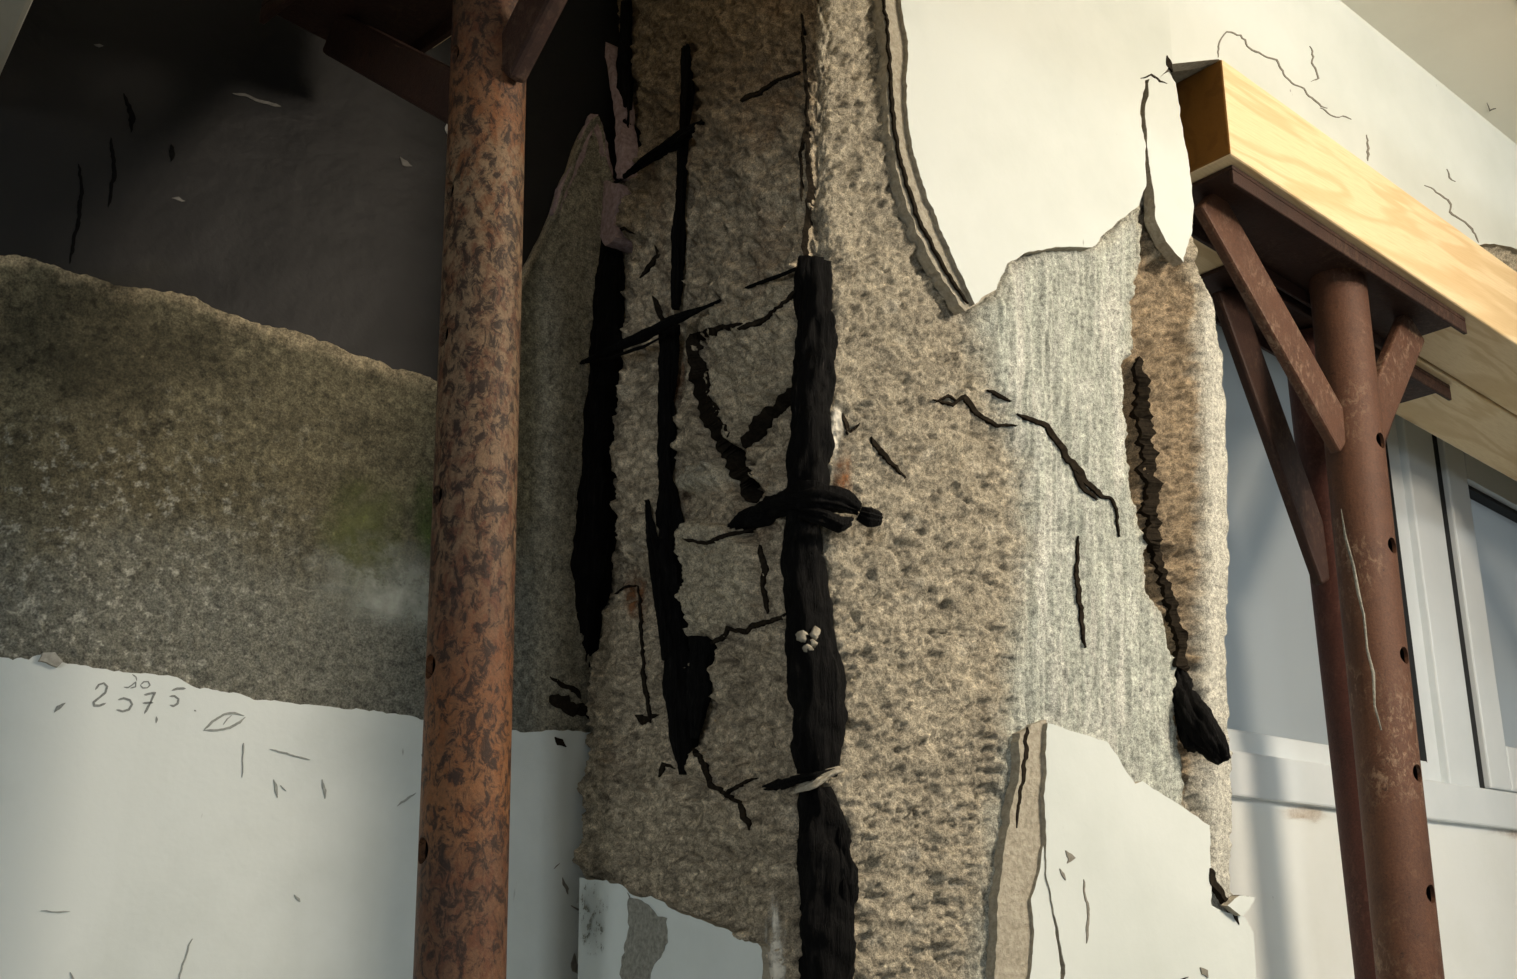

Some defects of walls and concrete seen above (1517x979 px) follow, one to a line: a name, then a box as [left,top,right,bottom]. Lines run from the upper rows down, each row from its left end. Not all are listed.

crack [1217,31,1351,119]
crack [882,0,969,304]
spalling [1482,246,1517,272]
spalling [0,254,437,720]
crack [620,226,795,646]
spalling [512,0,1209,979]
crack [842,413,907,479]
crack [932,356,1190,672]
damp [354,571,429,621]
peeling [204,715,245,731]
crack [1016,727,1030,828]
peeling [1220,896,1255,916]